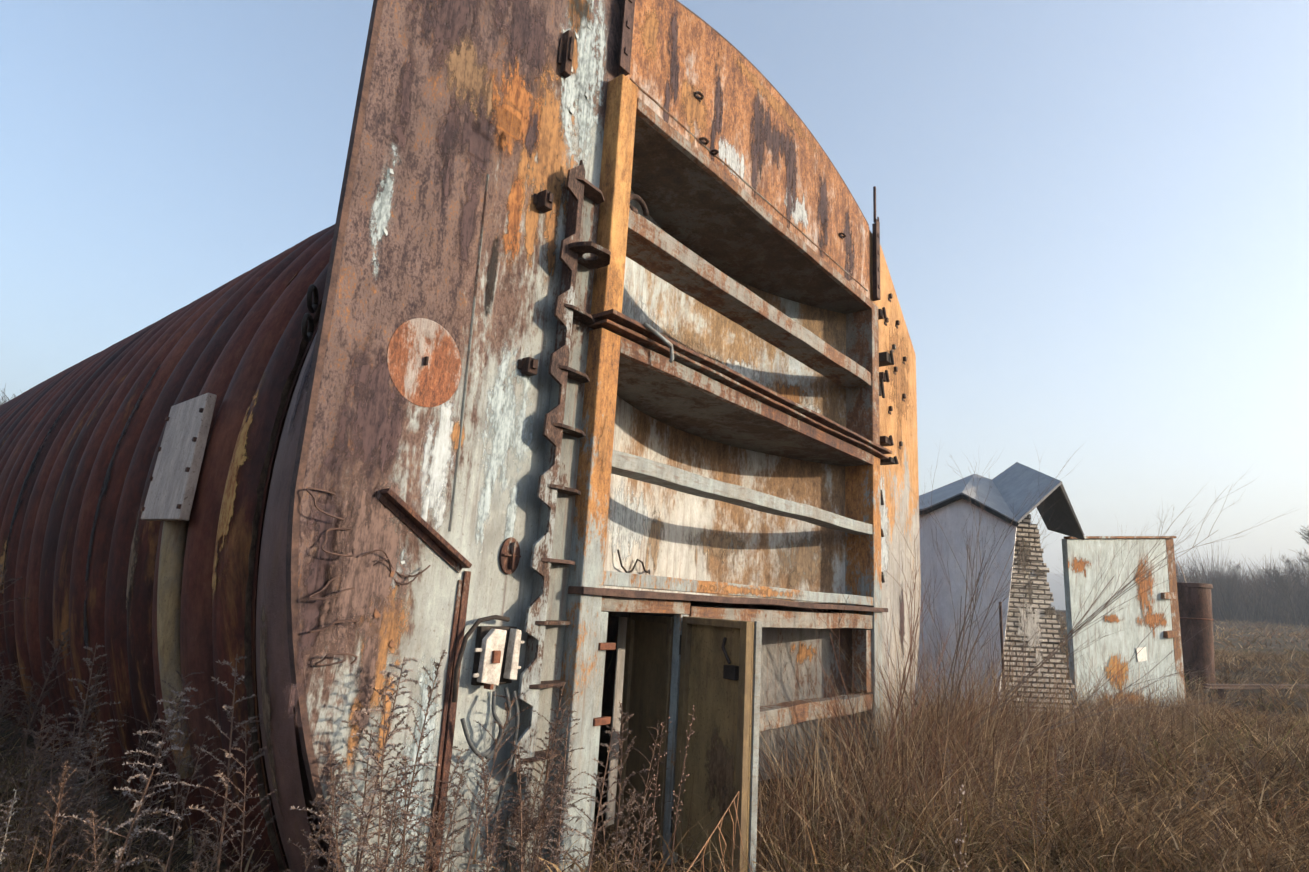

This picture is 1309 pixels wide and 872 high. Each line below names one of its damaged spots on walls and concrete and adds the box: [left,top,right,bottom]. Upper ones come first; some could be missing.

peeling [372,145,397,260]
corrosion [393,0,591,281]
peeling [561,0,606,164]
corrosion [750,91,797,228]
water stain [784,192,808,228]
corrosion [817,176,829,256]
peeling [212,390,259,592]
peeling [476,352,532,545]
corrosion [646,511,665,571]
corrosion [886,328,911,462]
corrosion [1135,555,1167,638]
peeling [391,658,438,861]